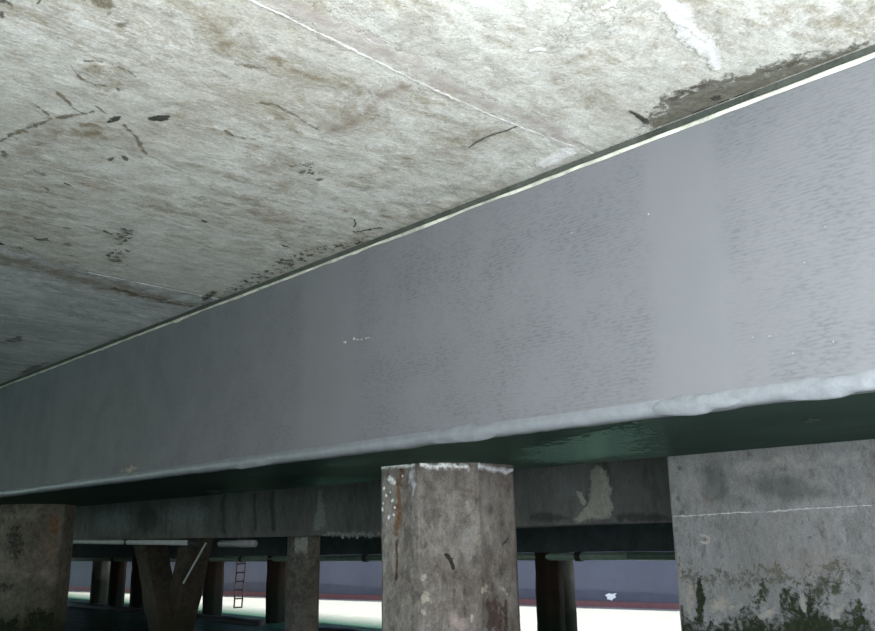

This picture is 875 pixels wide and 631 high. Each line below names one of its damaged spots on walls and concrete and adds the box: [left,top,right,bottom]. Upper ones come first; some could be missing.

damp [529,0,725,71]
spalling [629,41,868,135]
crack [468,126,517,148]
damp [696,577,705,626]
damp [752,578,793,615]
damp [810,578,844,605]